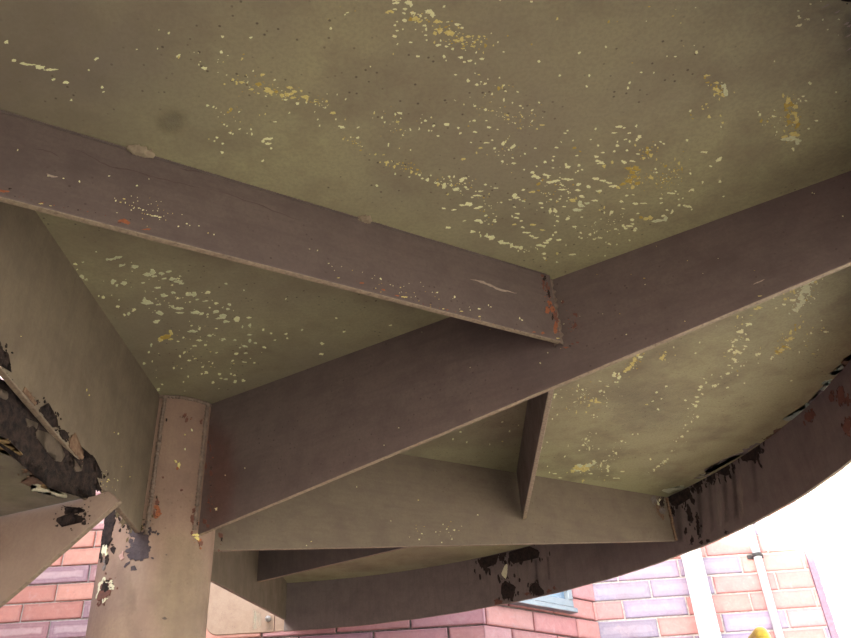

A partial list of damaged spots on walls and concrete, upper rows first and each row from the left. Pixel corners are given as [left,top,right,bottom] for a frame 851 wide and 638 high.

peeling [217,0,703,263]
peeling [98,256,266,389]
peeling [770,278,829,360]
peeling [566,353,645,418]
peeling [650,295,763,471]
peeling [0,437,67,498]
peeling [547,432,626,483]
peeling [662,350,851,517]
peeling [115,511,160,571]
rust [684,504,710,545]
peeling [474,545,556,605]